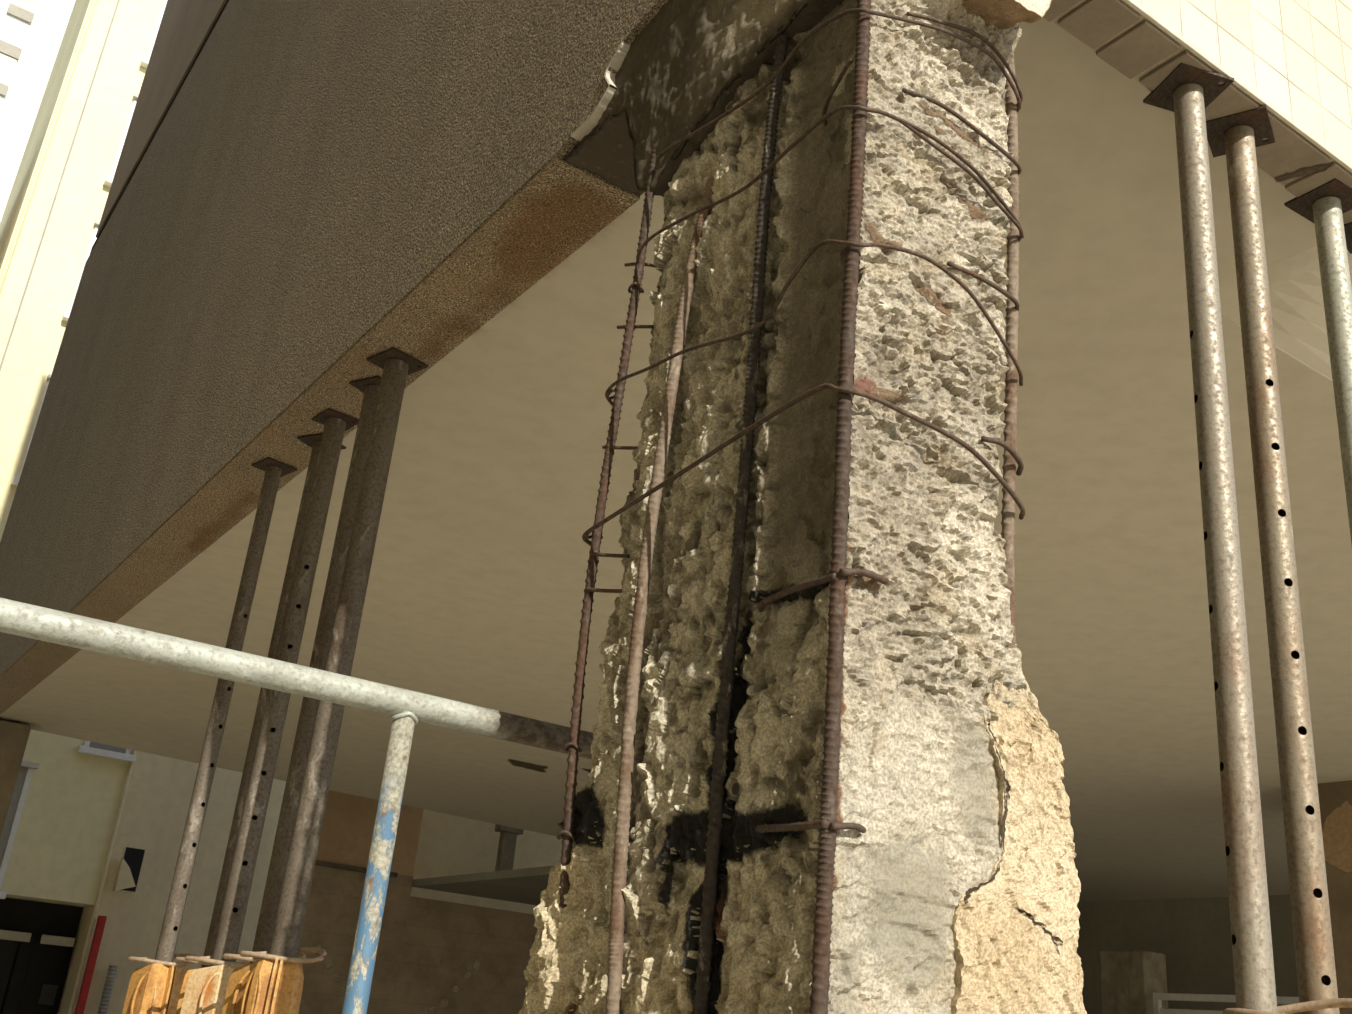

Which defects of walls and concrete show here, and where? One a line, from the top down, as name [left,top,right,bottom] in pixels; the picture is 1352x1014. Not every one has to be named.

peeling [570,41,630,141]
spalling [919,100,988,152]
spalling [940,176,989,221]
spalling [915,286,953,334]
spalling [748,582,829,604]
spalling [854,575,882,591]
spalling [508,759,547,772]
leakage [558,782,604,848]
crack [965,714,1011,904]
peeling [1322,801,1352,873]
crack [1016,908,1063,956]
corrosion [564,1002,578,1014]